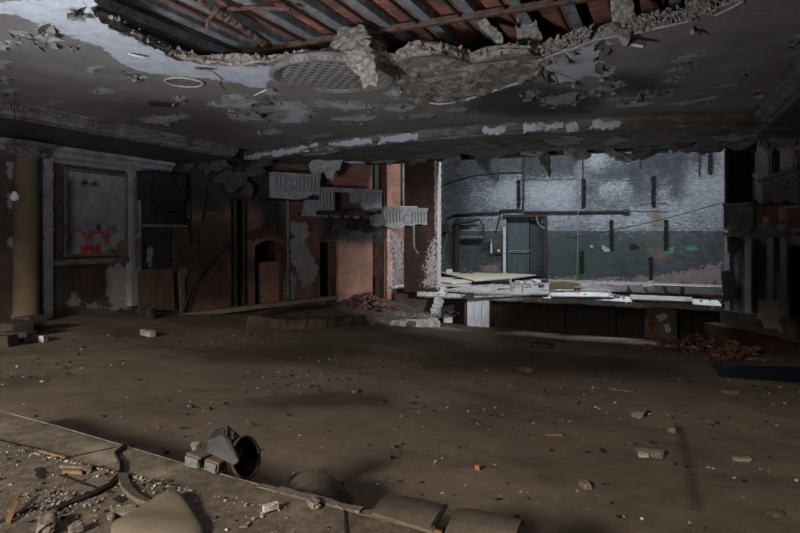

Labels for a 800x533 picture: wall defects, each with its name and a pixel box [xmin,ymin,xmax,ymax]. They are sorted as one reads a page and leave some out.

spalling [0,0,725,139]
peeling [244,132,418,160]
peeling [523,119,632,149]
peeling [65,177,154,313]
peeling [290,221,319,300]
peeling [323,213,404,292]
peeling [419,159,442,290]